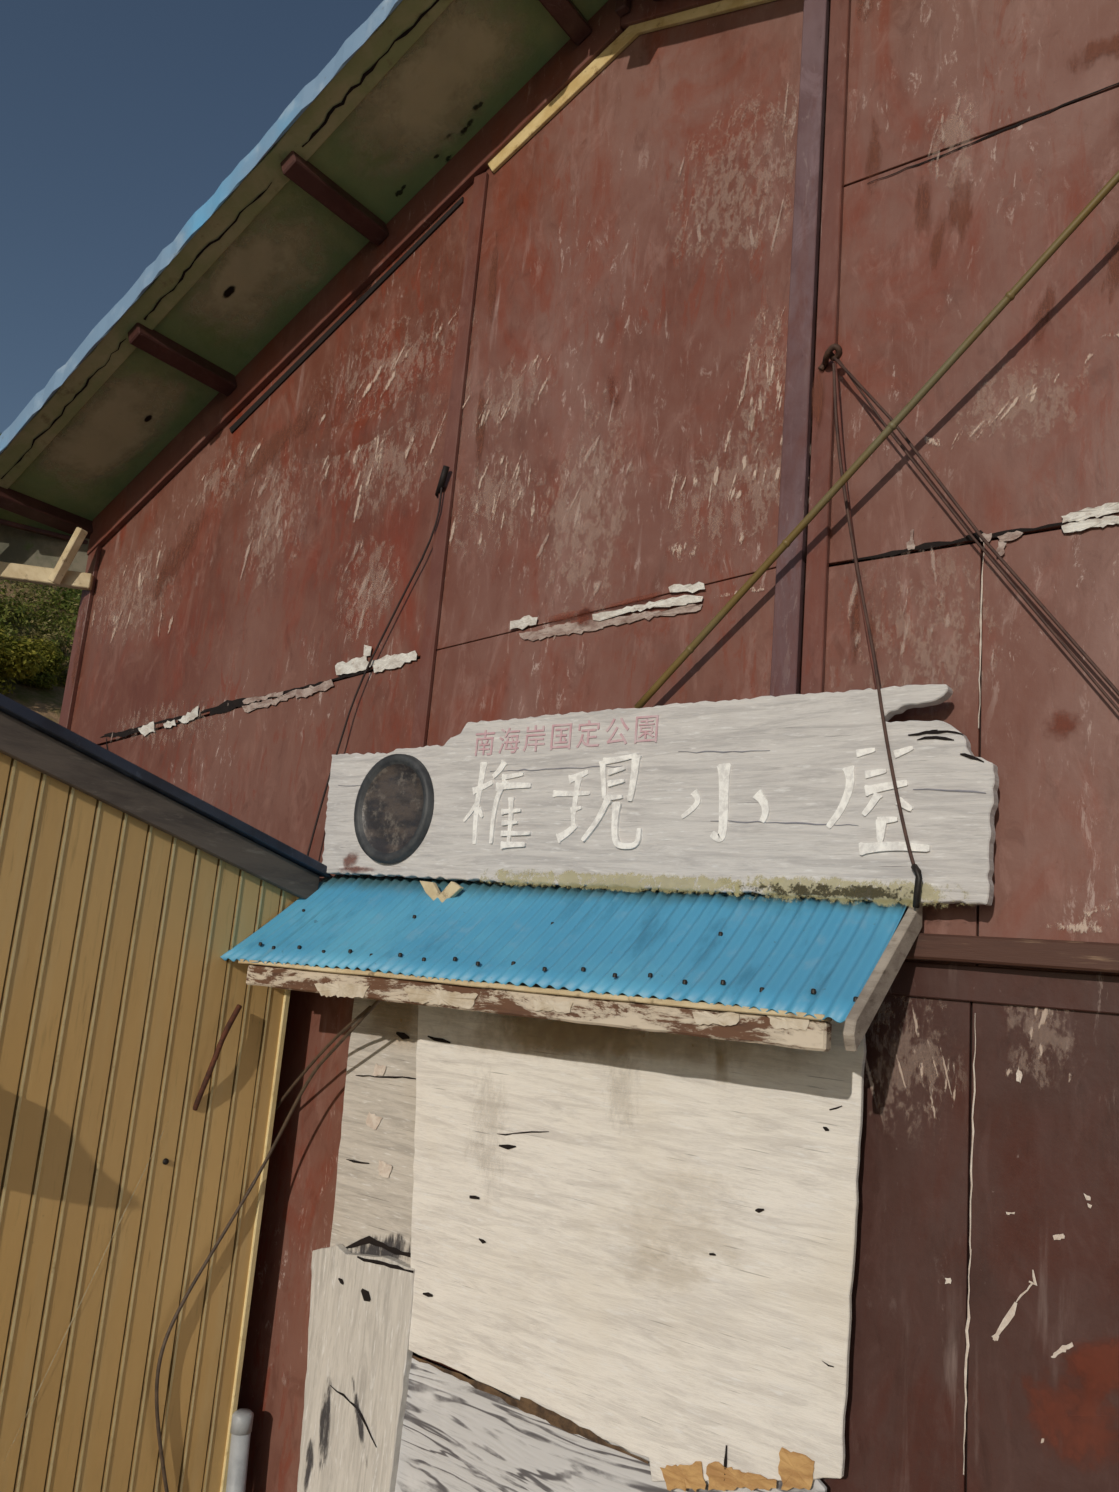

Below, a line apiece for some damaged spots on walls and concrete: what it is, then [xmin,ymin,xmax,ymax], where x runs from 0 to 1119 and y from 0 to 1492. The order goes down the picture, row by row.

peeling [1061,502,1119,533]
peeling [510,582,705,641]
peeling [242,645,417,713]
peeling [138,706,199,736]
peeling [315,983,369,998]
peeling [404,987,478,1009]
peeling [533,999,573,1013]
peeling [692,1011,739,1026]
peeling [767,1015,809,1031]